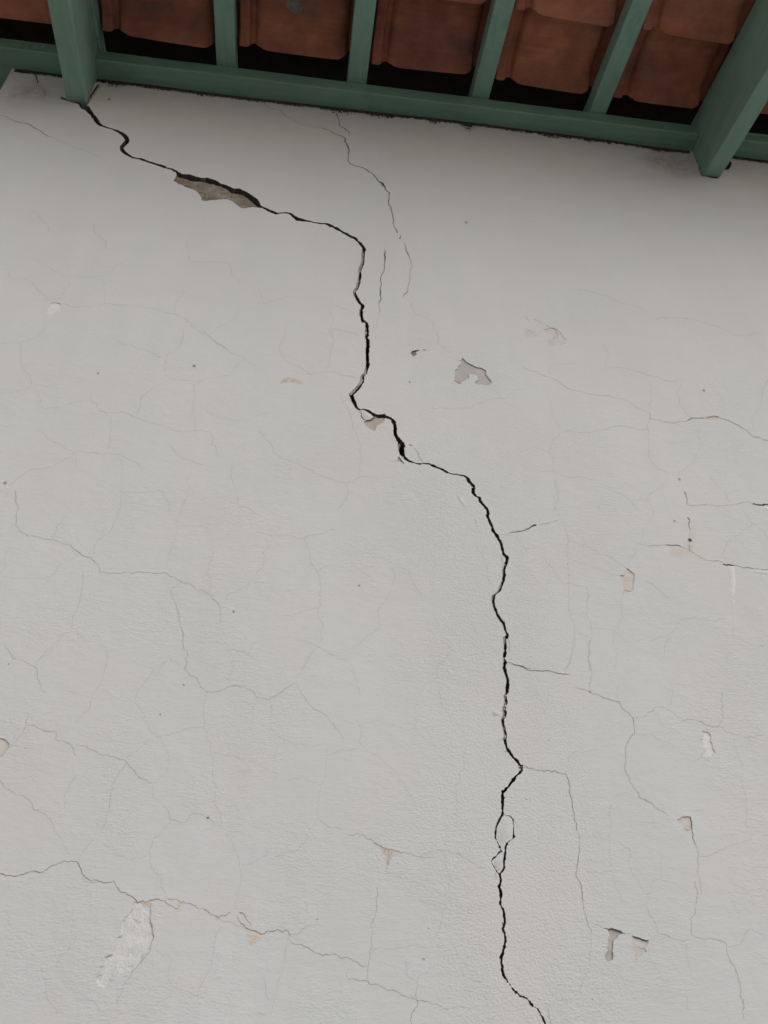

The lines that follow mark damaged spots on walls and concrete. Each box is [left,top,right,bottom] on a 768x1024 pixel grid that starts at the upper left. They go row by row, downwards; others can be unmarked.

spalling [174,174,258,208]
peeling [454,358,492,385]
crack [61,84,568,1024]
crack [2,861,177,909]
peeling [605,929,649,961]